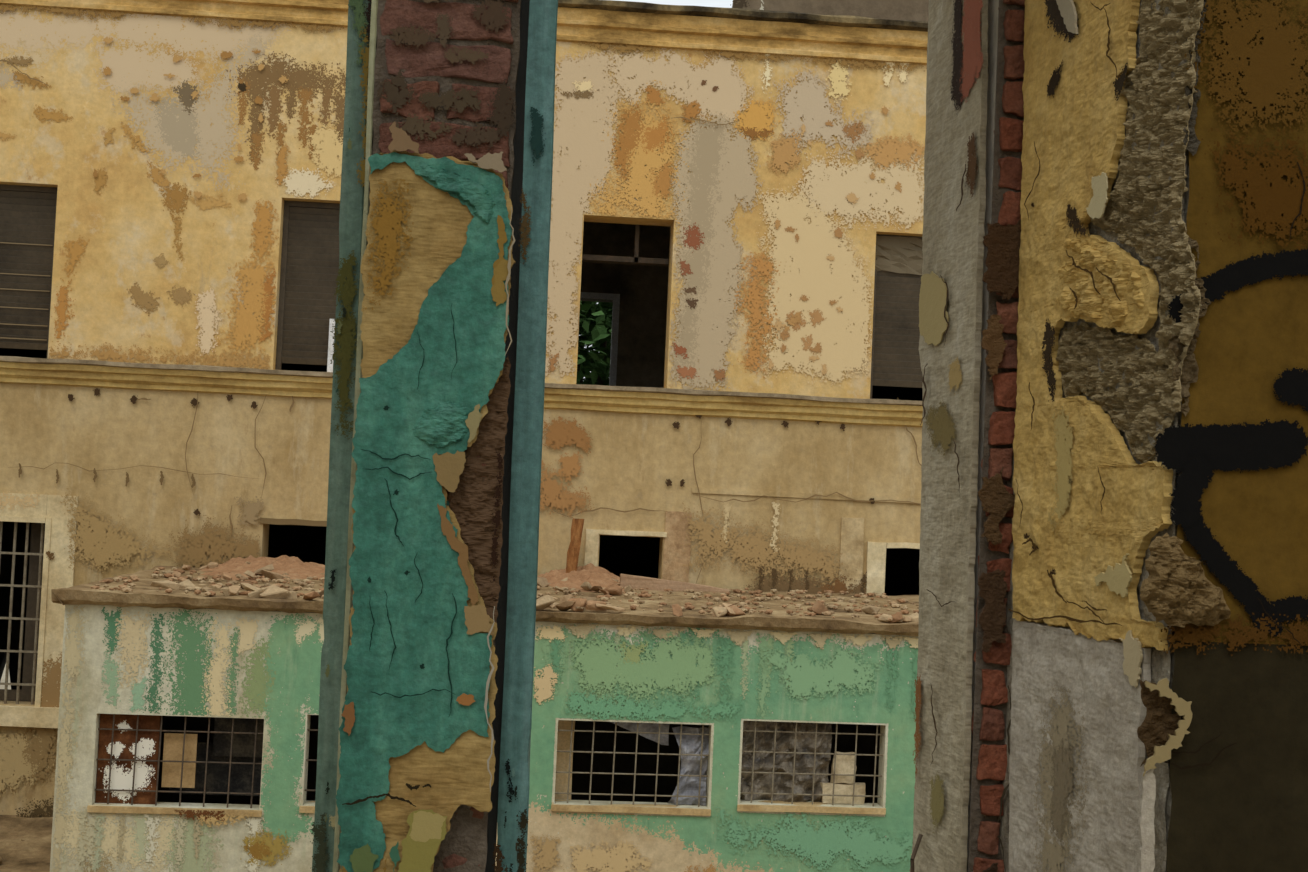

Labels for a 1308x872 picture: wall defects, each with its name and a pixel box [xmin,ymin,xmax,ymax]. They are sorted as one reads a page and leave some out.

crack [0,59,47,85]
leakage [48,16,346,369]
peeling [464,151,507,172]
peeling [529,45,925,391]
spalling [1042,0,1211,464]
spalling [433,357,511,635]
peeling [101,677,156,804]
leakage [101,607,276,718]
leakage [293,617,324,647]
crack [361,449,504,792]
spalling [1119,630,1193,777]
spalling [310,809,447,872]